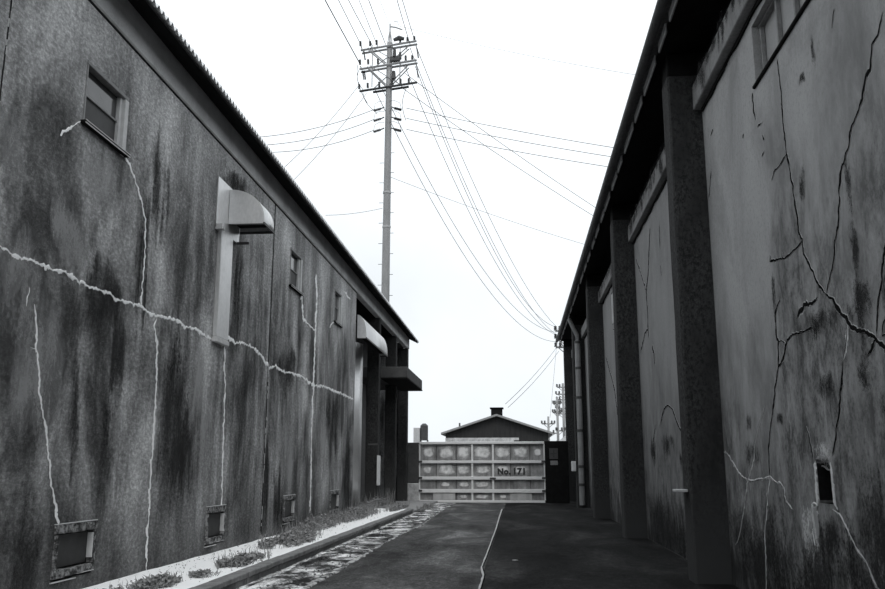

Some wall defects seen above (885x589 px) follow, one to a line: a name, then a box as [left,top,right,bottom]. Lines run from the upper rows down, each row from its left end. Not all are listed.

water stain [69,354,79,486]
water stain [86,255,126,392]
water stain [135,135,170,331]
crack [0,154,353,570]
water stain [156,333,210,512]
water stain [233,256,244,346]
water stain [262,423,293,527]
crack [636,225,662,364]
crack [653,404,681,442]
crack [724,13,885,589]
water stain [728,470,885,589]
water stain [847,281,872,390]